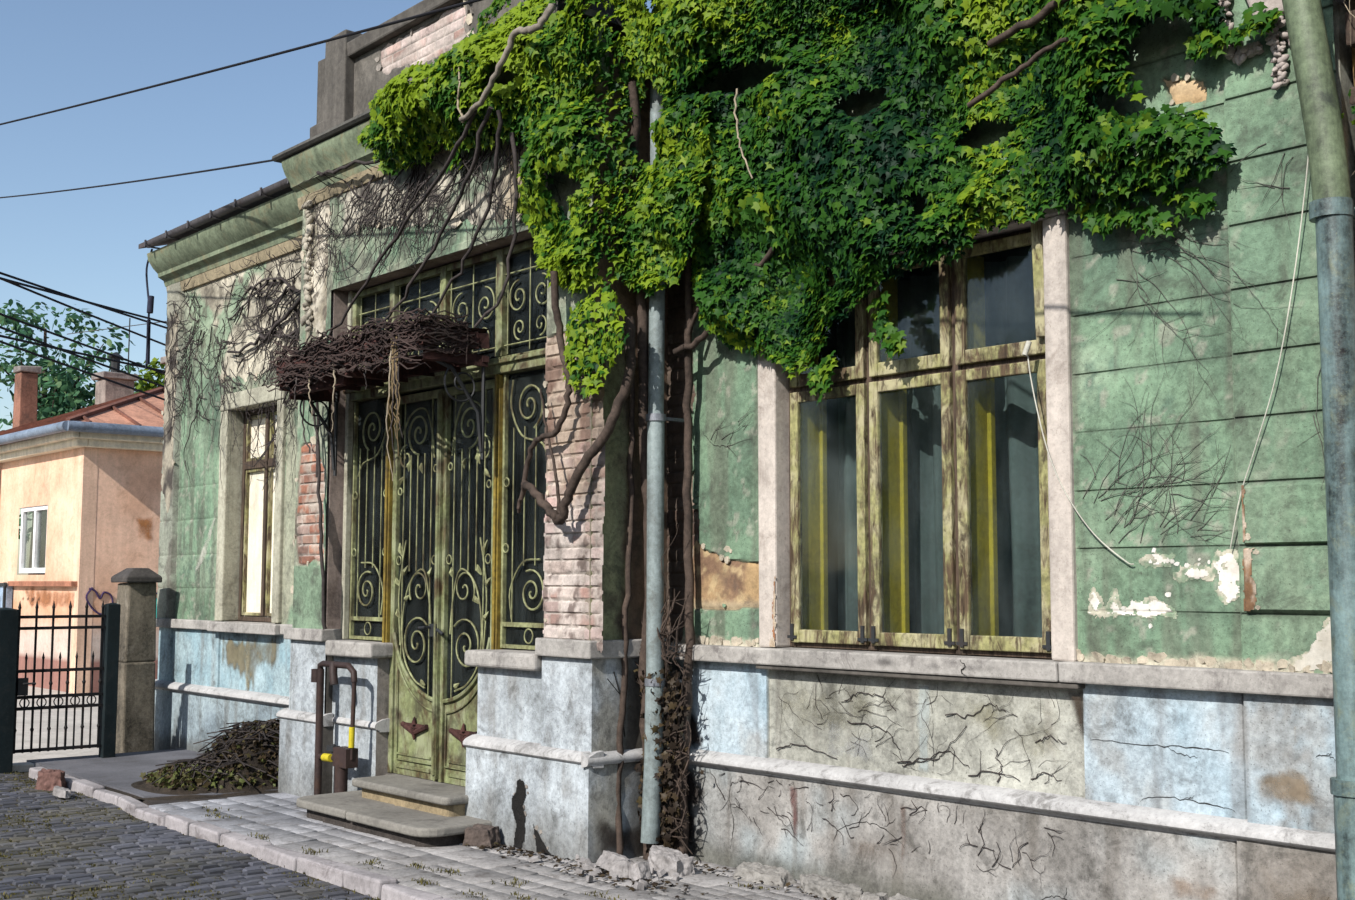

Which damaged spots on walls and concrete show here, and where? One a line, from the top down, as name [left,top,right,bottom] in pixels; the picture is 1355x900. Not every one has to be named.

flaking render [375,0,474,75]
spalling [1163,72,1207,105]
spalling [161,127,527,513]
spalling [666,242,777,647]
flaking render [293,436,327,567]
peeling [1088,485,1261,629]
leakage [223,639,276,690]
spalling [1076,617,1332,674]
spalling [512,779,551,856]
crack [840,807,904,847]